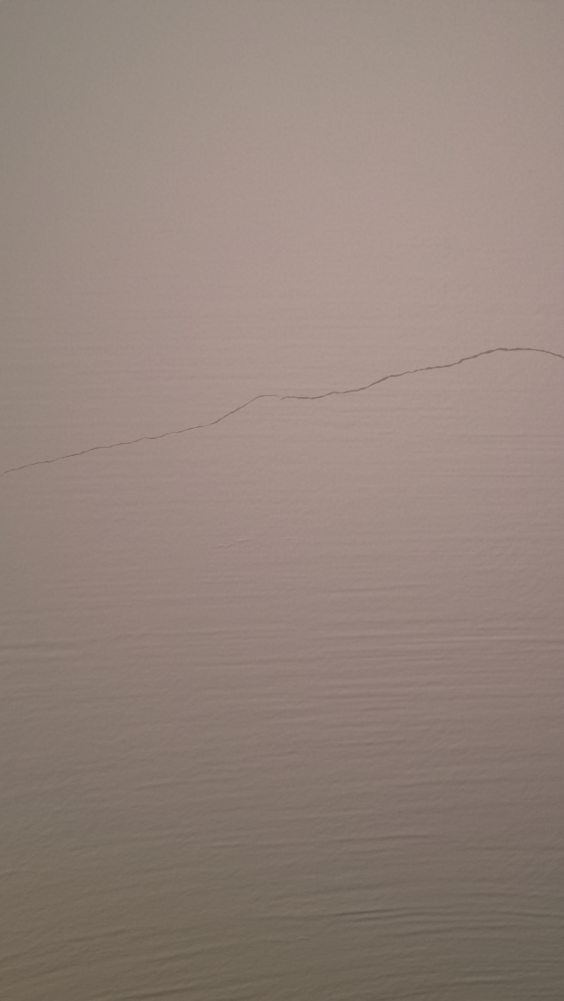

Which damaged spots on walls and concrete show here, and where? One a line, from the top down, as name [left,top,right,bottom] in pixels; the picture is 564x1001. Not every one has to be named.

crack [1,348,564,476]